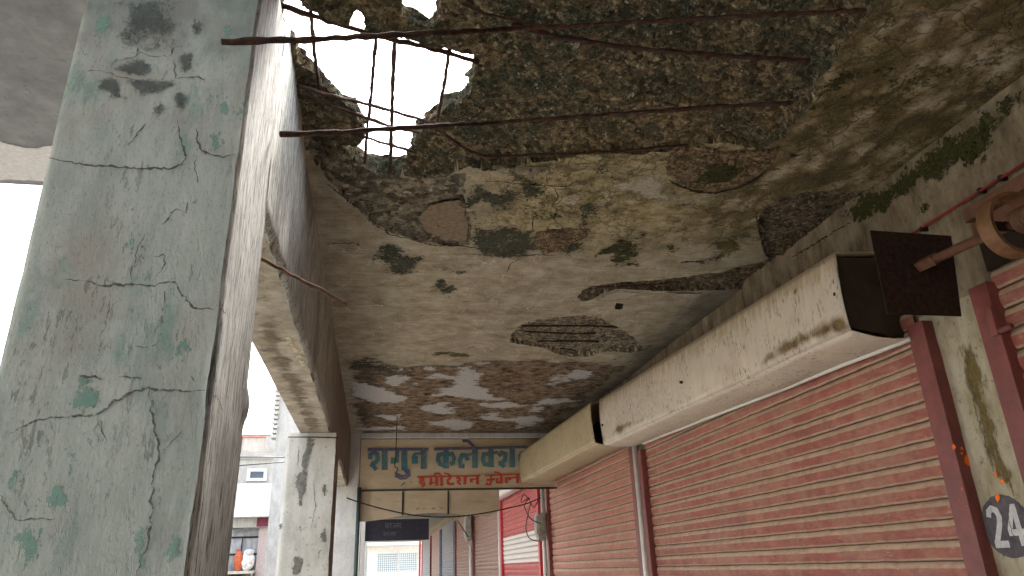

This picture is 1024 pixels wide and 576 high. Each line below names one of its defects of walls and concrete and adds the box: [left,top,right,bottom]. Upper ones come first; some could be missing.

damp [98,0,187,113]
damp [179,53,192,71]
spalling [221,0,874,246]
spalling [578,176,890,310]
crack [16,120,230,576]
peeling [344,315,642,433]
crack [0,495,55,521]